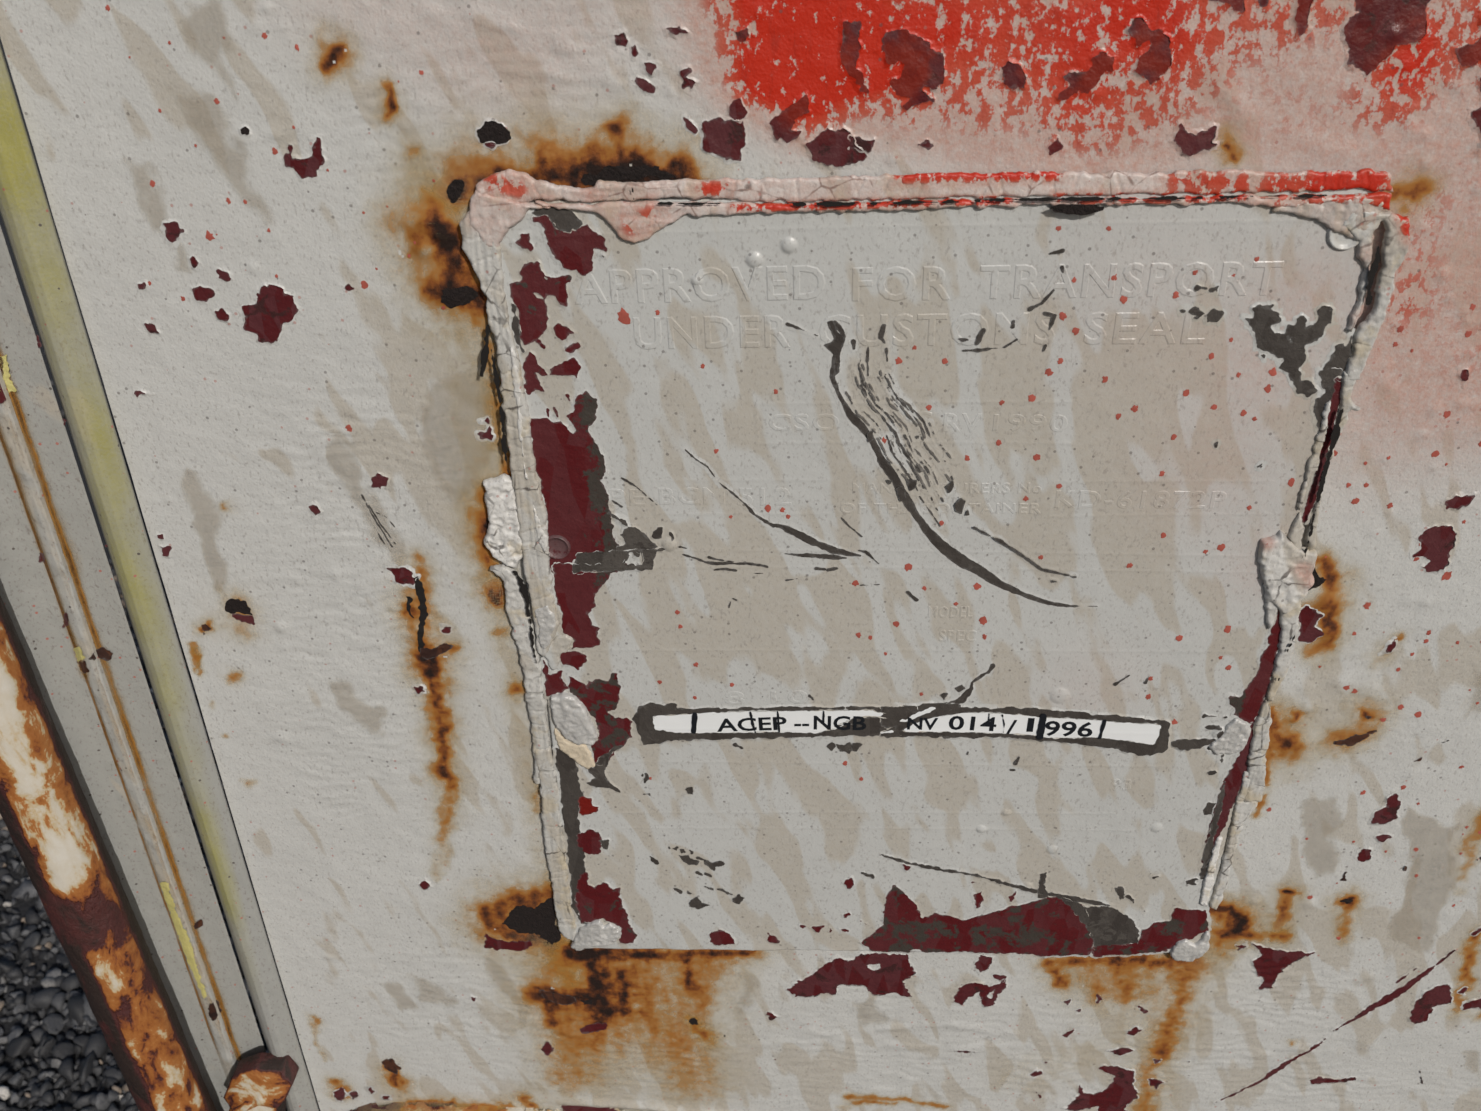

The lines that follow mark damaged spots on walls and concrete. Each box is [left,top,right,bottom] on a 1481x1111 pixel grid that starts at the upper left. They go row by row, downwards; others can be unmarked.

peeling [609,27,879,171]
peeling [1339,0,1434,79]
peeling [160,218,303,347]
rust [385,111,706,477]
peeling [1177,281,1355,525]
rust [0,378,241,1111]
rust [398,553,462,842]
rust [467,482,506,610]
peeling [483,200,1326,951]
rust [1301,552,1346,658]
rust [468,881,763,1096]
peeling [764,851,1212,1008]